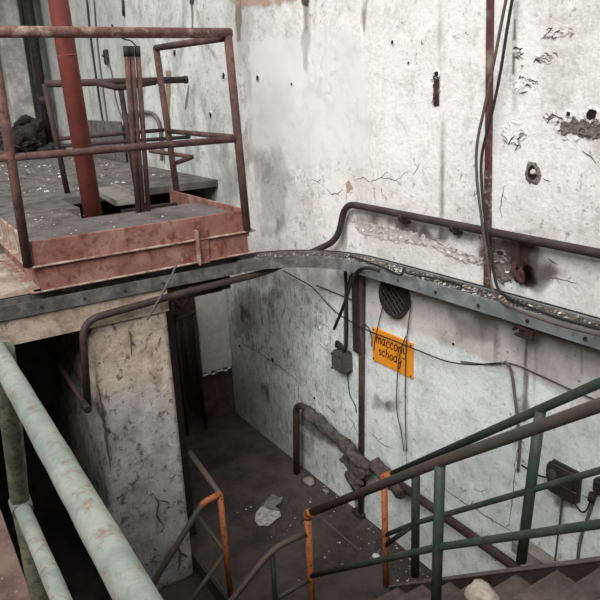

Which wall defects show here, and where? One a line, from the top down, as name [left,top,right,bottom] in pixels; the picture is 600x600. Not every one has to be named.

spalling [540,23,574,39]
spalling [513,46,526,67]
spalling [533,52,558,64]
spalling [512,76,538,94]
spalling [501,120,528,151]
spalling [543,104,600,140]
crack [359,163,420,186]
spalling [352,219,484,266]
spalling [493,249,512,285]
crack [96,384,111,471]